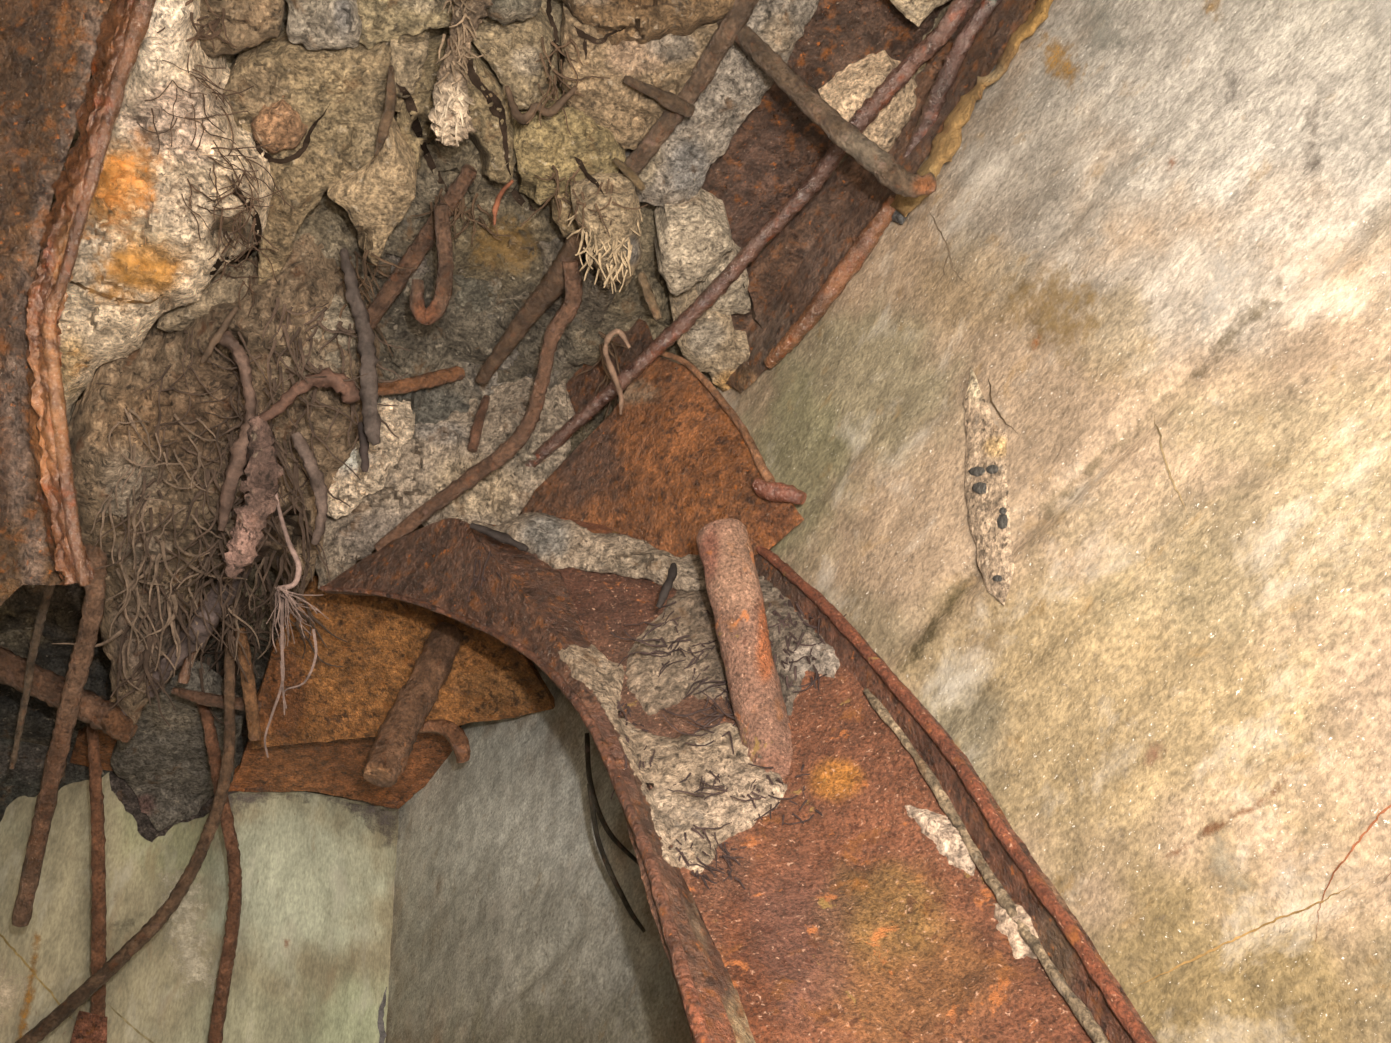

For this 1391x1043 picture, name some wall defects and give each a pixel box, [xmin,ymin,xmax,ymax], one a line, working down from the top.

rust [91,150,154,227]
rust [97,254,176,298]
spalling [0,0,1002,1043]
spalling [962,367,1014,606]